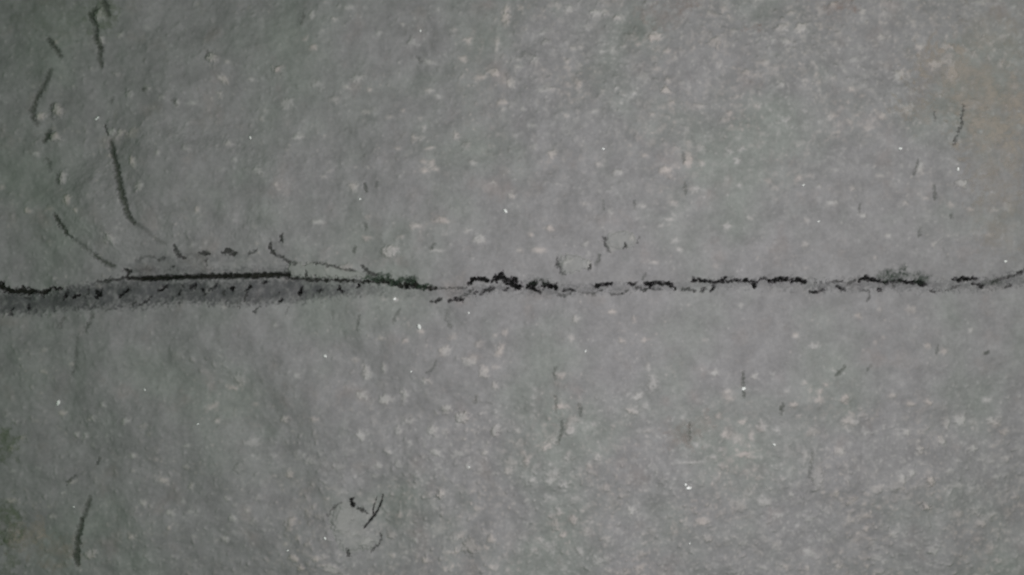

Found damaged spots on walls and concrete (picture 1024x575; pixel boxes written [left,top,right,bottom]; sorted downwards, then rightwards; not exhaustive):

crack [105,125,135,224]
crack [0,281,62,295]
crack [98,257,926,303]
crack [951,271,1022,288]